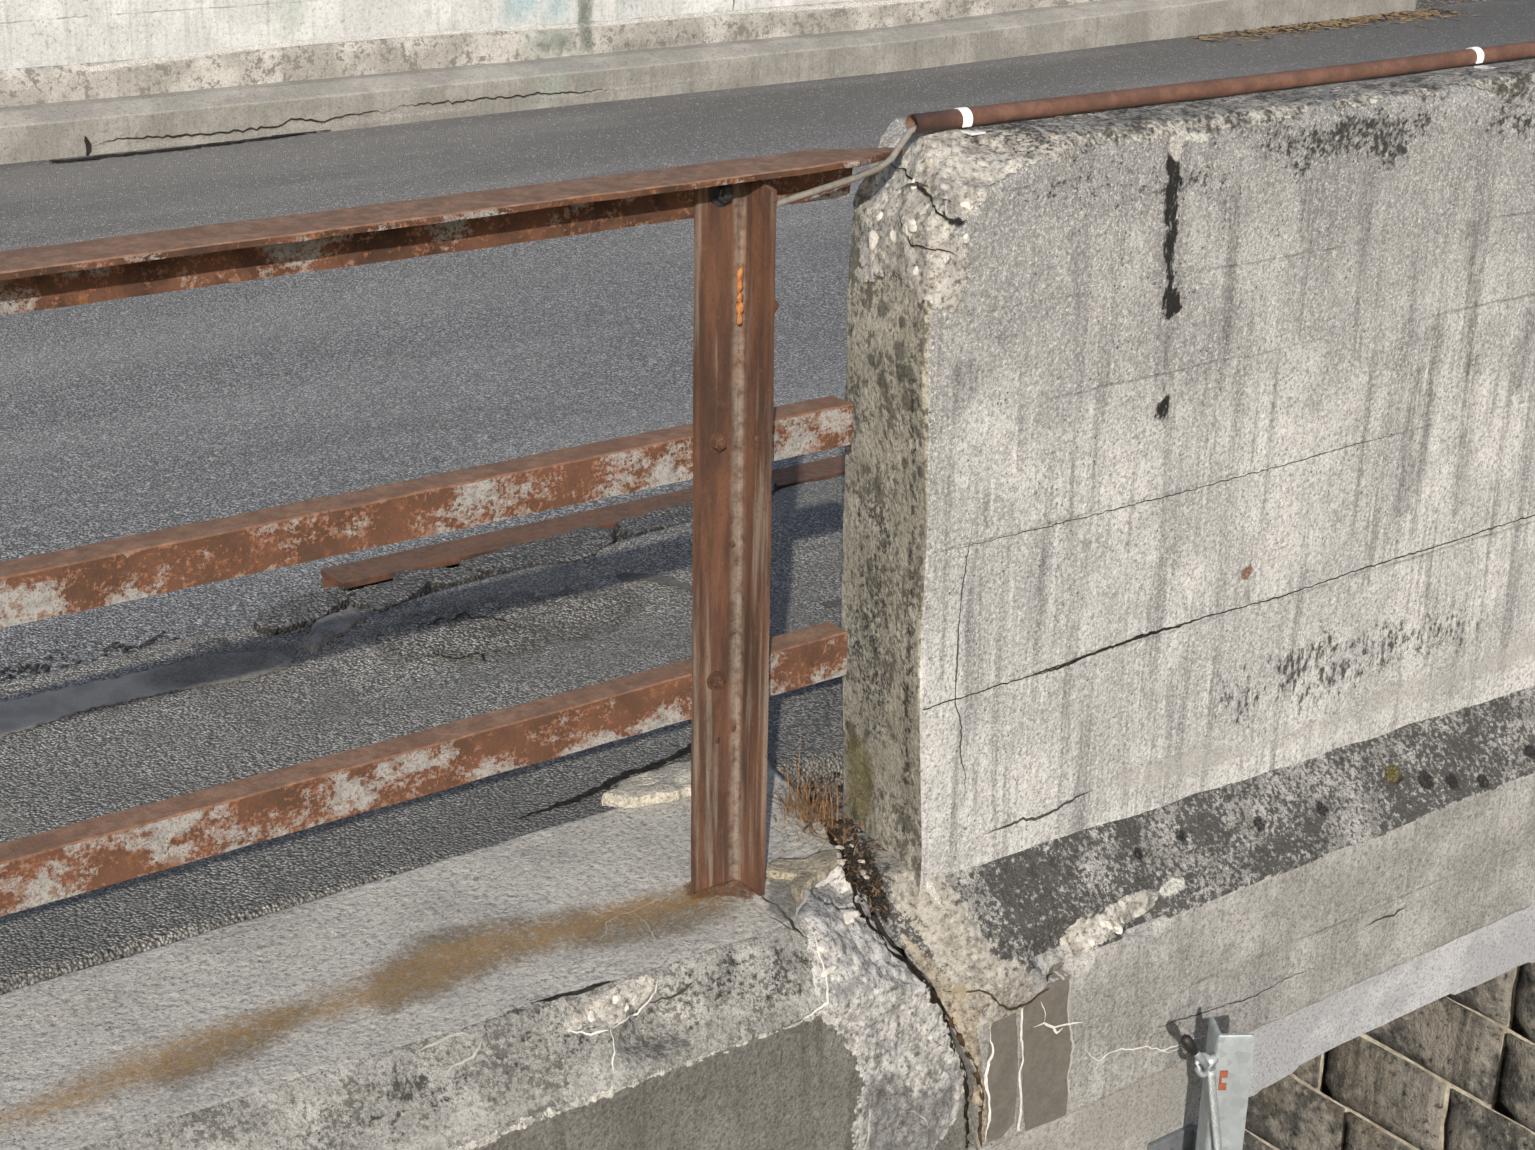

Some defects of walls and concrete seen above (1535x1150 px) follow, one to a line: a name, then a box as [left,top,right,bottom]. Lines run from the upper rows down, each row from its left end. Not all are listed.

crack [84,88,611,156]
spalling [857,59,1535,313]
damp [1260,106,1447,179]
damp [1476,99,1535,143]
rust [735,267,744,326]
damp [846,330,920,839]
crack [923,427,1535,802]
damp [1268,609,1535,737]
crack [986,790,1093,834]
spalling [1059,878,1185,959]
spalling [406,850,1034,1150]
crack [821,823,1309,1148]